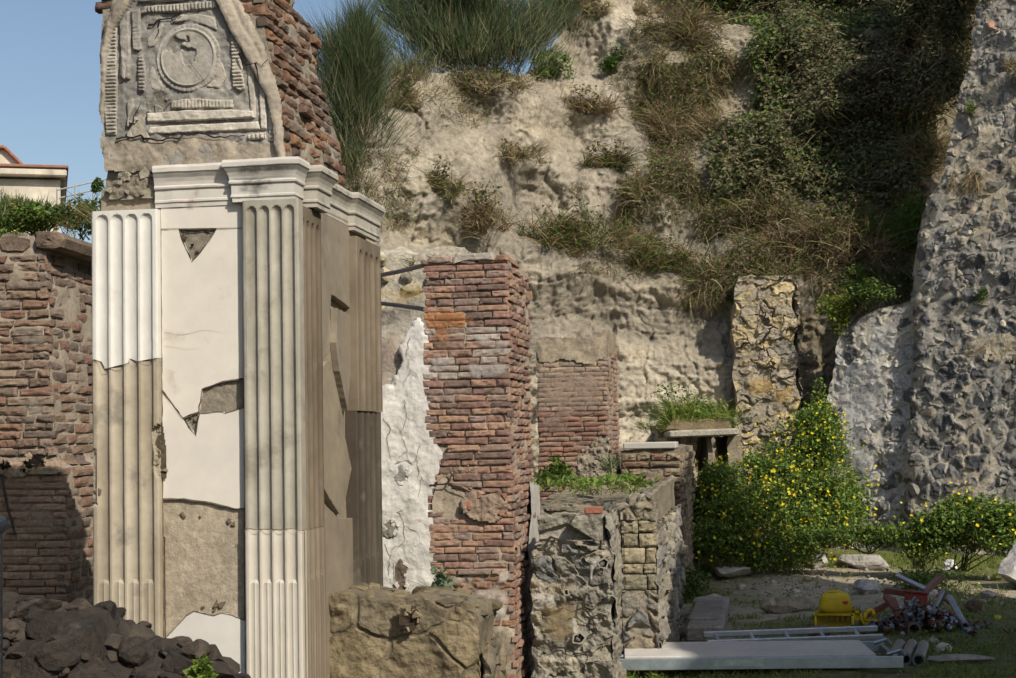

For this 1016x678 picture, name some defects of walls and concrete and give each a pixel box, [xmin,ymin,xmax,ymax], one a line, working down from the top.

peeling [178,228,216,262]
peeling [183,378,244,436]
spalling [155,423,168,478]
crack [383,338,499,586]
peeling [162,498,246,638]